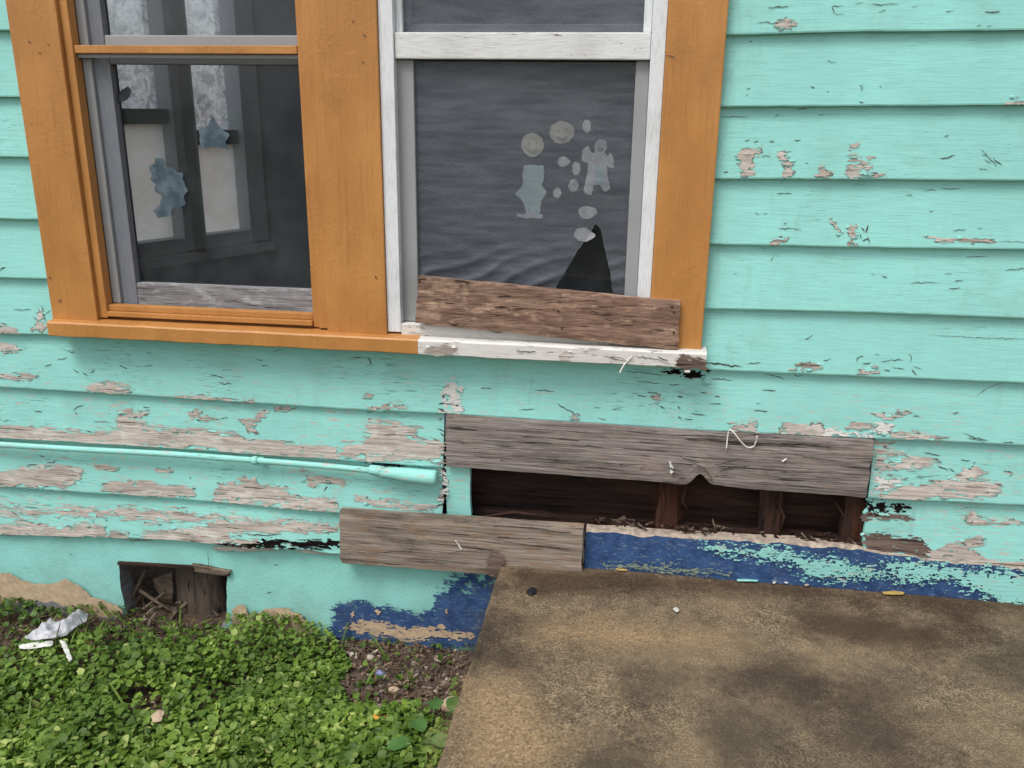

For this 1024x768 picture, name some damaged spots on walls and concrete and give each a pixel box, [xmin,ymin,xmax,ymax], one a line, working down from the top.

peeling [735,144,763,178]
peeling [776,150,796,178]
peeling [814,143,886,179]
peeling [829,218,860,246]
peeling [922,234,998,244]
peeling [423,345,458,357]
peeling [674,354,709,381]
peeling [438,376,464,414]
peeling [0,380,451,552]
peeling [697,409,1024,605]
peeling [329,573,497,650]